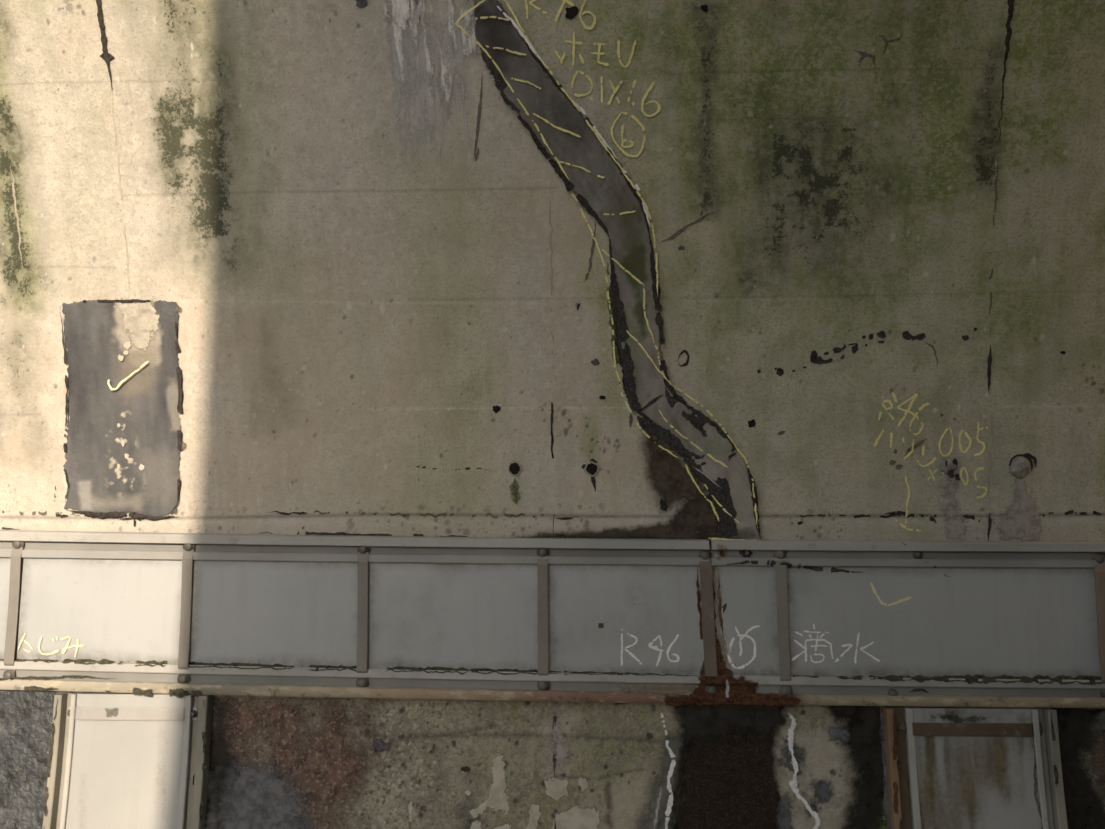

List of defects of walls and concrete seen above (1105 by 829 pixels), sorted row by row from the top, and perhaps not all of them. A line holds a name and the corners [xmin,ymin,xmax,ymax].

water stain [384,0,482,162]
crack [854,35,904,68]
crack [993,0,1015,225]
crack [2,0,186,527]
crack [482,38,715,458]
crack [728,268,993,541]
crack [259,510,580,535]
crack [1040,509,1101,517]
rust [621,545,801,708]
water stain [638,704,805,829]
water stain [805,780,832,817]
water stain [828,706,885,829]